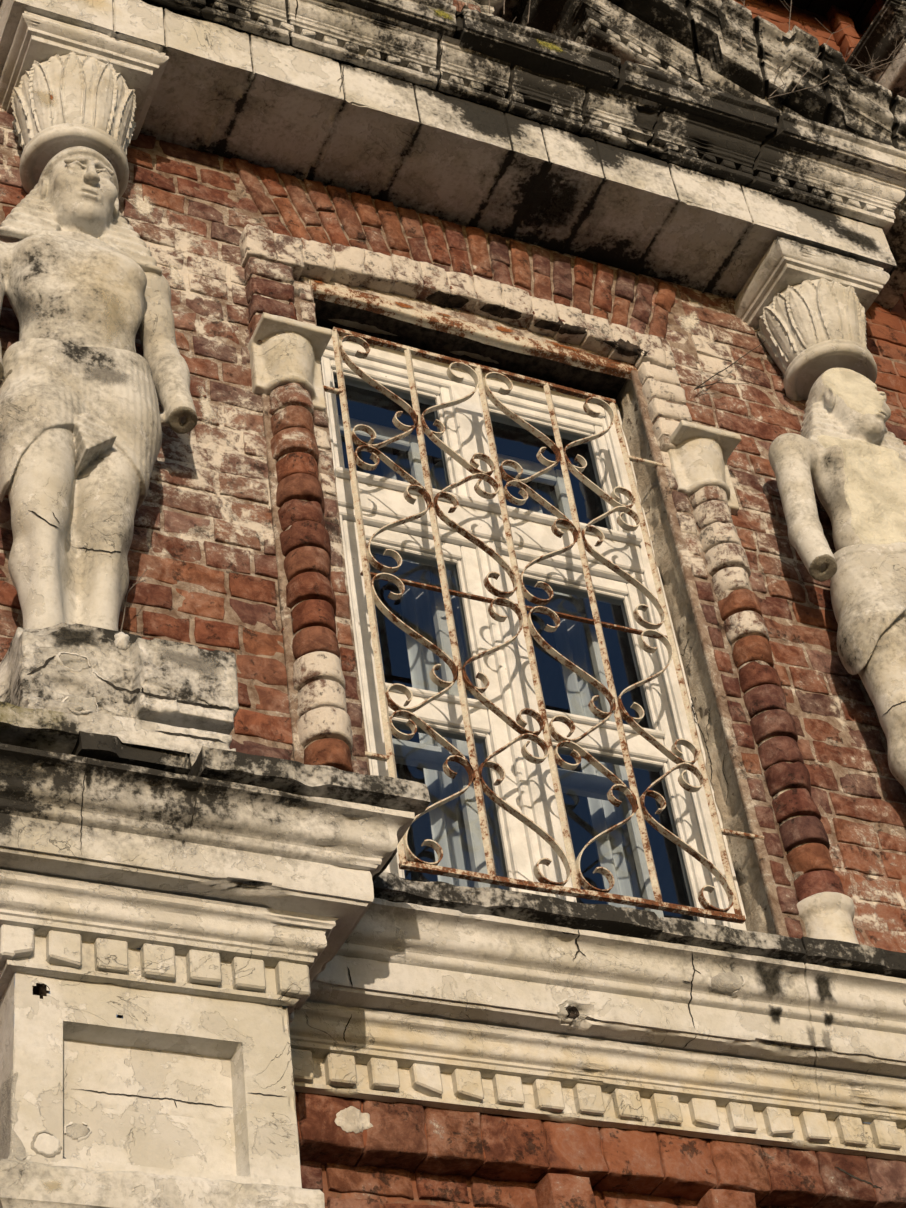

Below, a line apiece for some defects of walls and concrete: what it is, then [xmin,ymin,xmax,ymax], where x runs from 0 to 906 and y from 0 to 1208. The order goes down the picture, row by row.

leakage [537,39,562,51]
leakage [535,185,579,227]
crack [28,655,56,674]
crack [683,954,701,1048]
leakage [756,961,782,1022]
leakage [808,974,833,1051]
flaking render [0,1068,92,1160]
crack [77,1089,287,1108]